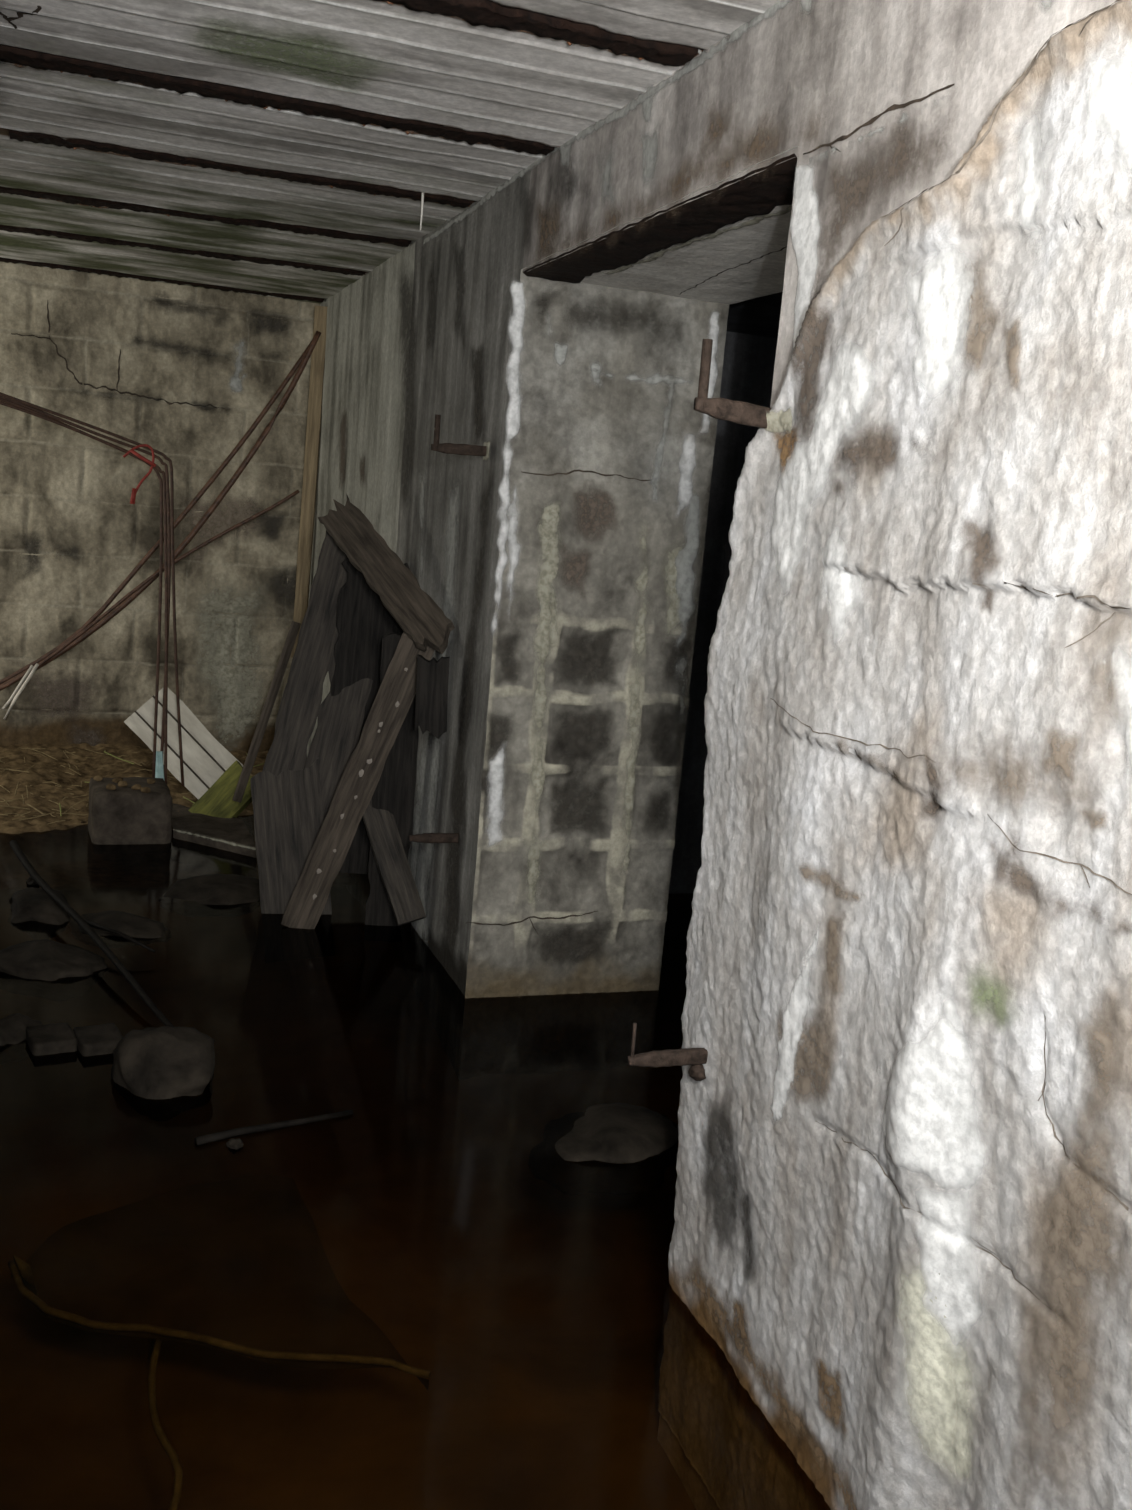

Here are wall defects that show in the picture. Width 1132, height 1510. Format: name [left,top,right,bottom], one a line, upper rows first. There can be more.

crack [803,84,955,155]
crack [880,0,1120,246]
crack [11,300,223,408]
damp [772,127,941,590]
damp [908,251,1020,393]
damp [411,282,550,954]
damp [623,312,719,871]
damp [823,532,860,638]
crack [972,582,1129,648]
crack [770,698,936,763]
damp [1103,654,1132,756]
damp [771,919,840,1121]